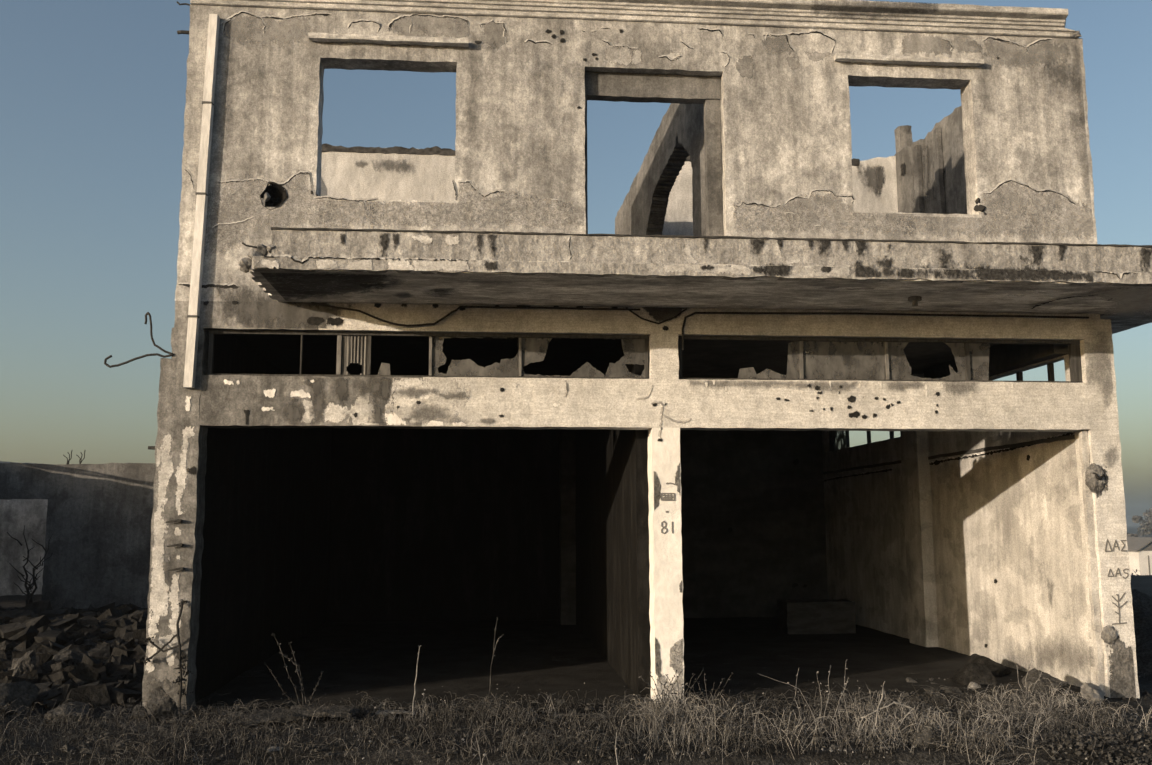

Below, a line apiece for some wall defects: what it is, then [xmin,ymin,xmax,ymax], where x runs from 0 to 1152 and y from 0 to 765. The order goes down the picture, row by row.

peeling [392,15,508,49]
peeling [762,35,831,70]
crack [983,179,1080,206]
peeling [207,175,584,270]
peeling [388,259,470,271]
leakage [477,234,497,270]
leakage [750,239,792,276]
peeling [244,389,276,424]
peeling [290,378,470,426]
peeling [145,426,197,714]
peeling [655,638,684,703]
peeling [1107,636,1136,698]